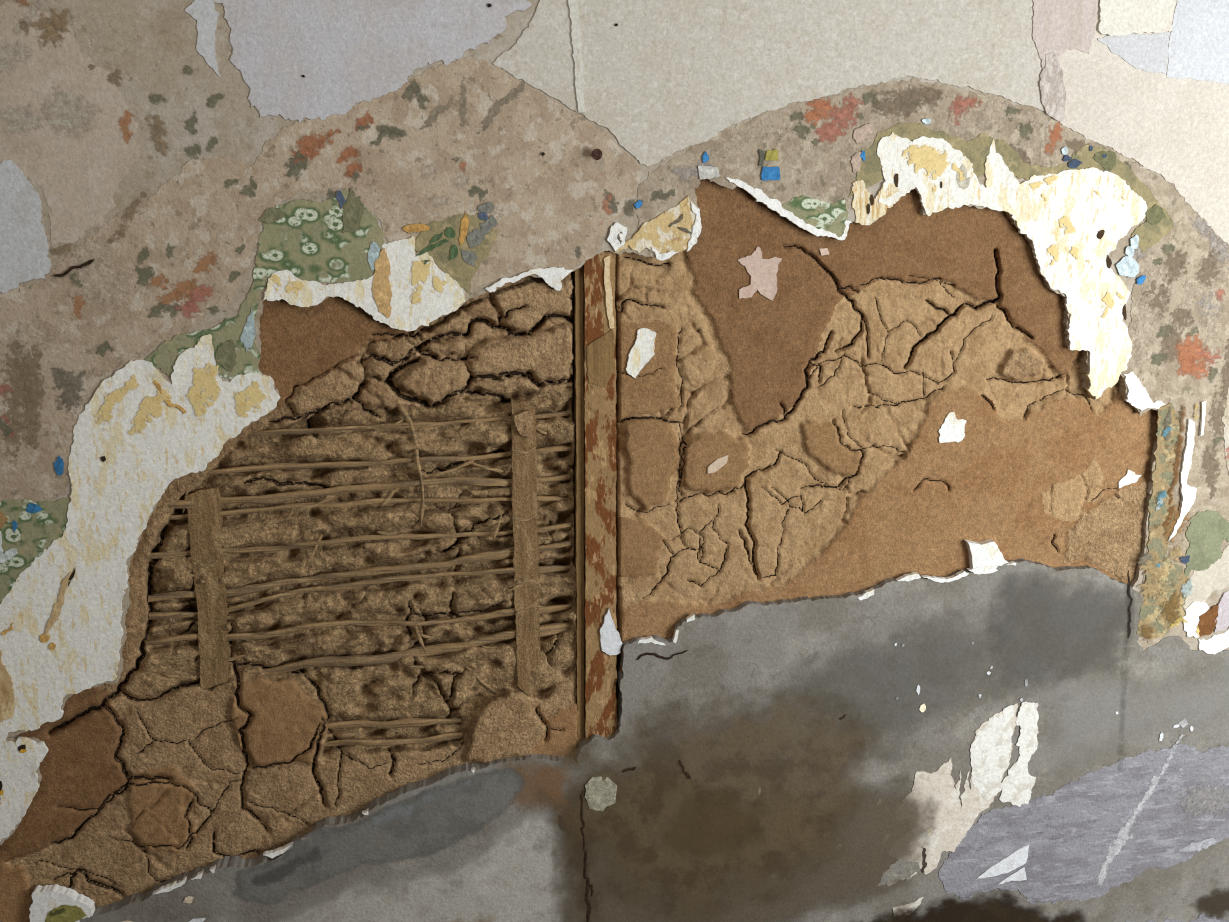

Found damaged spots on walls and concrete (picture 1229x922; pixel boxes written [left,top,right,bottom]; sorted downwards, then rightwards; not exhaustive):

peeling [185,0,532,233]
peeling [0,160,226,319]
crack [269,306,570,438]
crack [616,245,1031,594]
spalling [586,149,1229,718]
crack [981,373,1093,417]
crack [34,527,463,896]
spalling [0,241,579,922]
water stain [558,792,926,922]
water stain [874,893,1084,922]
peeling [878,679,1229,904]
water stain [1003,582,1124,681]